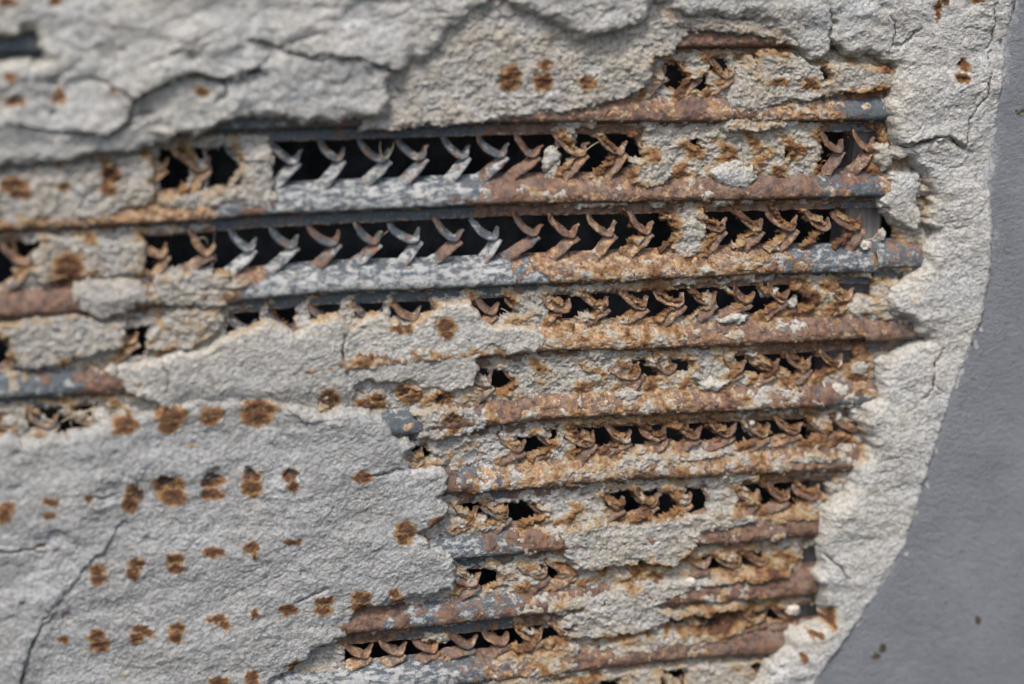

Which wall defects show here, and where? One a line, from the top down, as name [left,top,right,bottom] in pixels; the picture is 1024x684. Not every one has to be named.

rust [498,59,553,93]
spalling [356,0,896,256]
rust [154,404,226,434]
rust [239,399,281,429]
rust [317,383,464,435]
spalling [0,120,932,684]
rust [121,472,227,515]
rust [281,468,300,493]
rust [393,516,445,545]
crack [0,544,46,553]
crack [20,587,67,684]
rust [128,622,185,646]